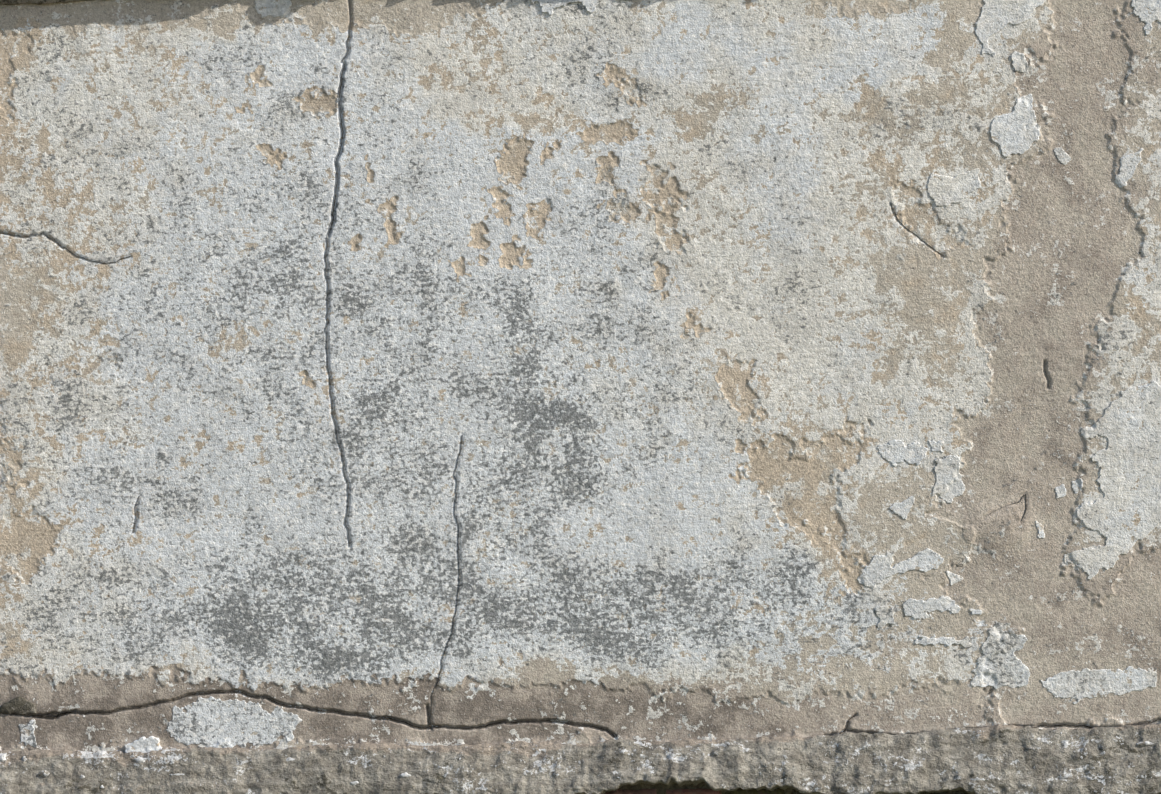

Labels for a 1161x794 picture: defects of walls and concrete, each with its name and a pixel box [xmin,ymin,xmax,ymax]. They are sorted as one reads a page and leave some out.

peeling [0,0,222,127]
peeling [235,0,504,38]
crack [0,232,131,263]
crack [325,0,352,544]
peeling [448,132,563,283]
peeling [576,119,691,301]
peeling [903,0,1161,730]
peeling [729,416,944,597]
crack [12,435,615,737]
peeling [0,664,995,753]
spalling [605,782,802,794]
crack [1036,722,1093,730]